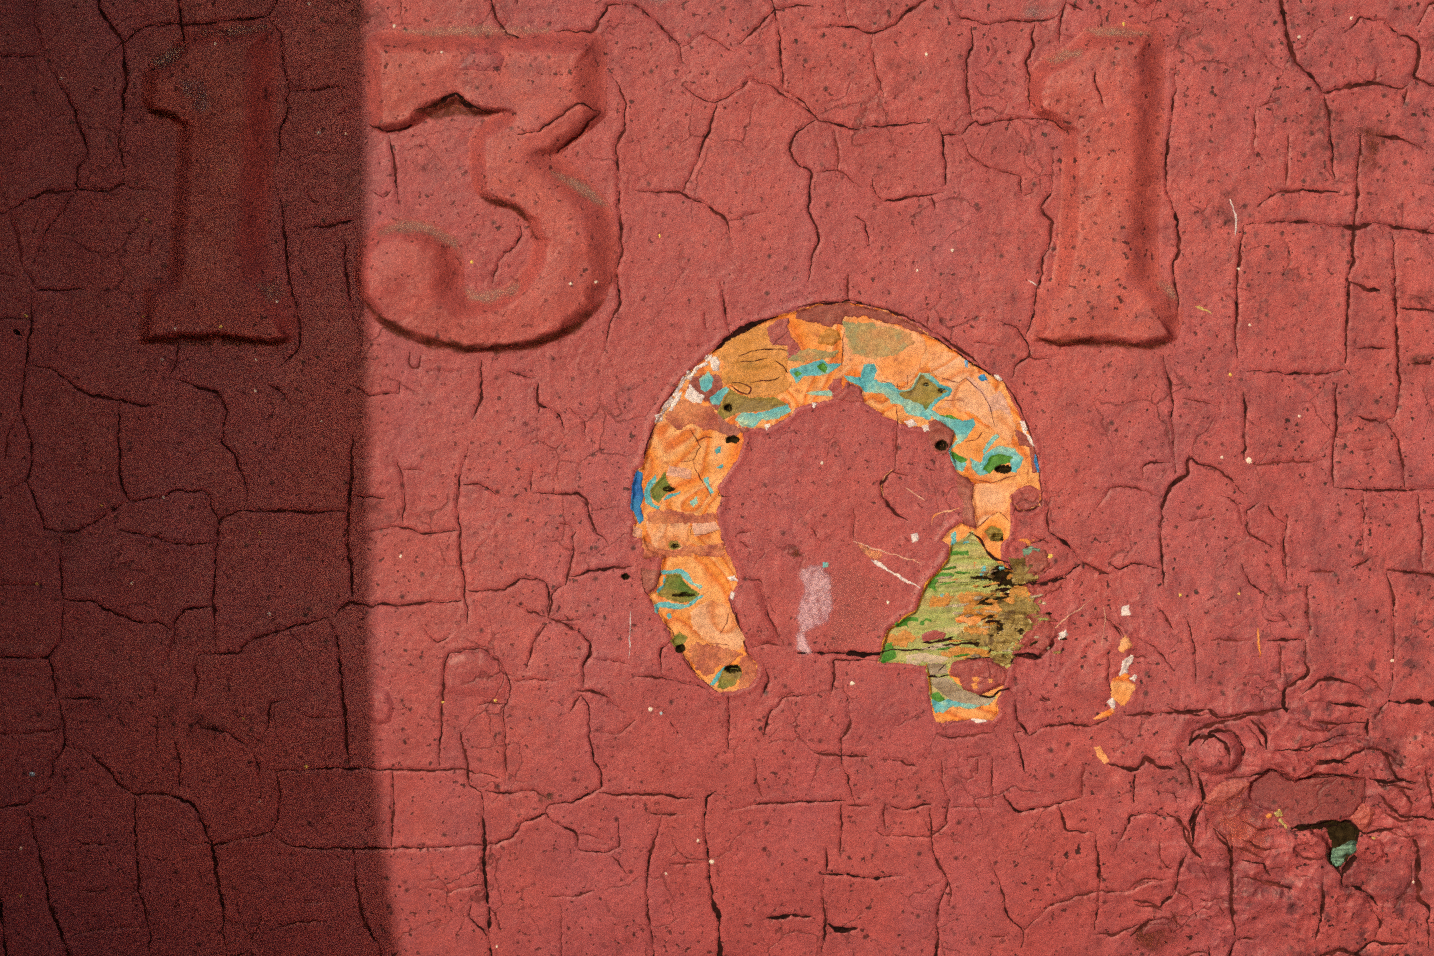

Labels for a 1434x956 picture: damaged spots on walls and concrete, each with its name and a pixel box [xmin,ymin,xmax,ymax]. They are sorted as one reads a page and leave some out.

crack [517,0,1083,382]
crack [0,0,730,956]
peeling [621,301,1068,723]
crack [731,0,1434,956]
peeling [1202,710,1386,870]